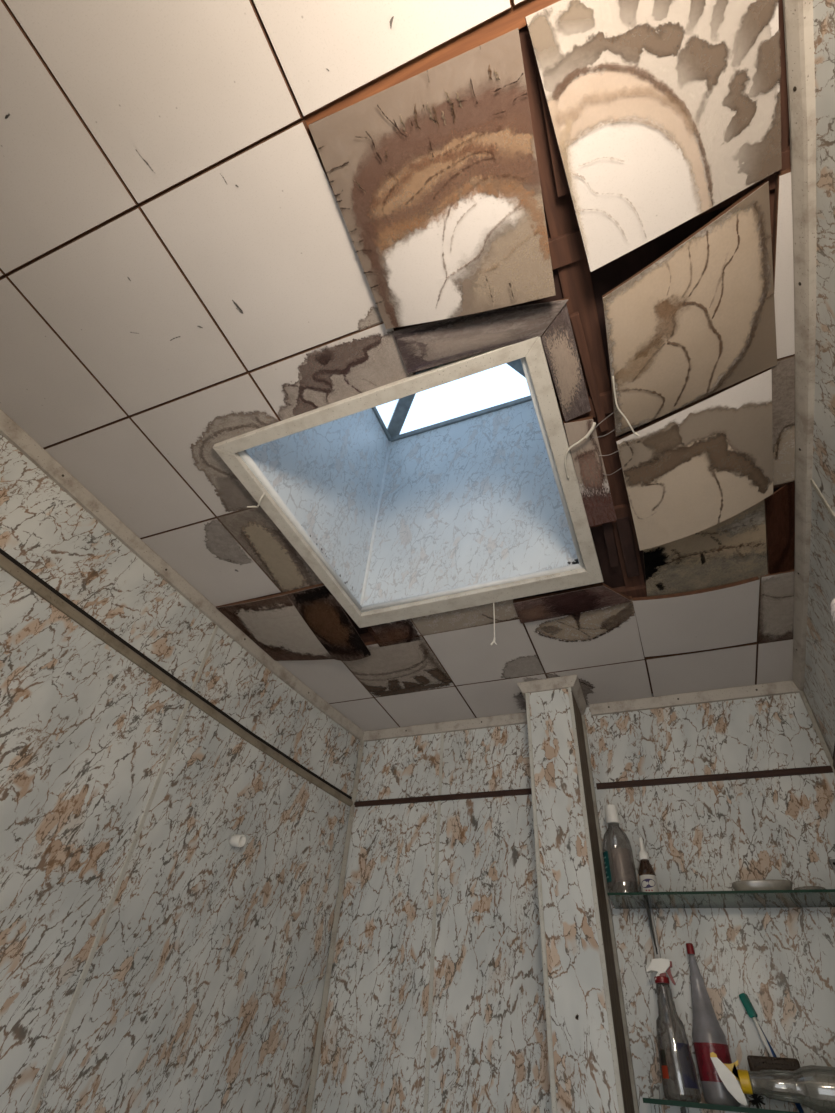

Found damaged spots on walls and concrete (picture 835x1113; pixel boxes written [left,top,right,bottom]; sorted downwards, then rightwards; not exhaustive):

damp [190,0,795,697]